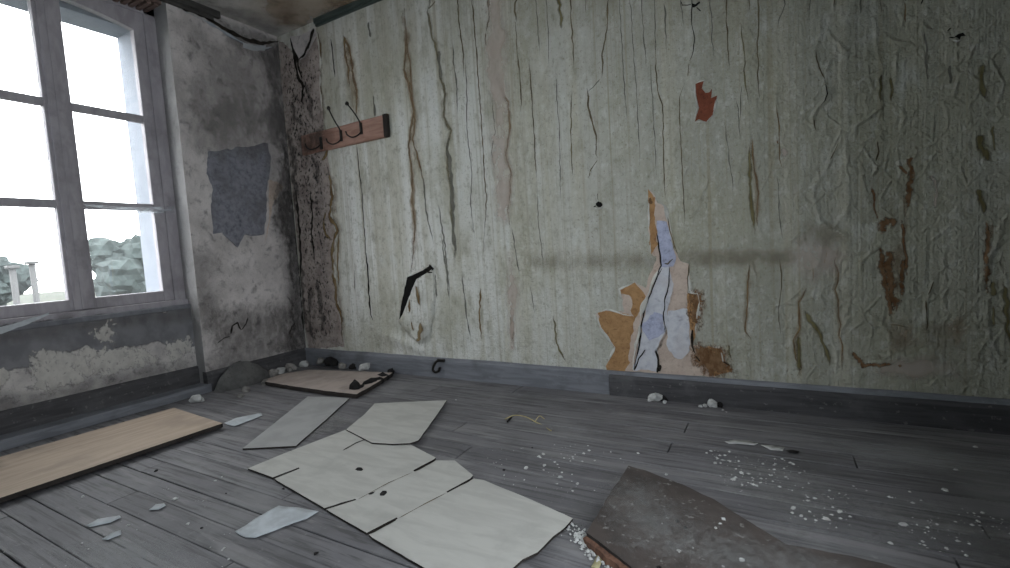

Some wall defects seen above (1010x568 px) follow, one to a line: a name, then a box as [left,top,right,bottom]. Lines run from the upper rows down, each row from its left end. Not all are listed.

peeling [0,308,195,395]
peeling [178,8,345,349]
damp [267,45,343,351]
damp [343,37,358,113]
damp [408,287,423,341]
damp [404,0,496,297]
damp [499,0,537,213]
peeling [596,189,733,377]
peeling [693,80,717,122]
corrosion [852,352,901,368]
corrosion [871,189,908,327]
corrosion [899,157,915,207]